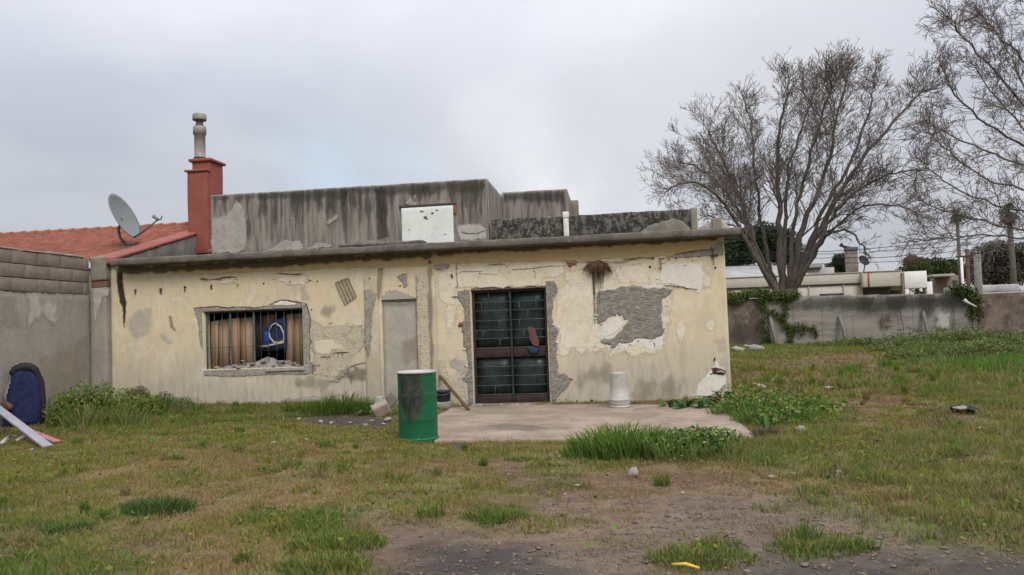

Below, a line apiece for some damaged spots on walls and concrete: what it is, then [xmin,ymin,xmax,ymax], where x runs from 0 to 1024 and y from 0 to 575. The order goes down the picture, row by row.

damp [211,180,485,239]
peeling [311,339,343,362]
damp [93,224,717,324]
flaking render [360,241,724,405]